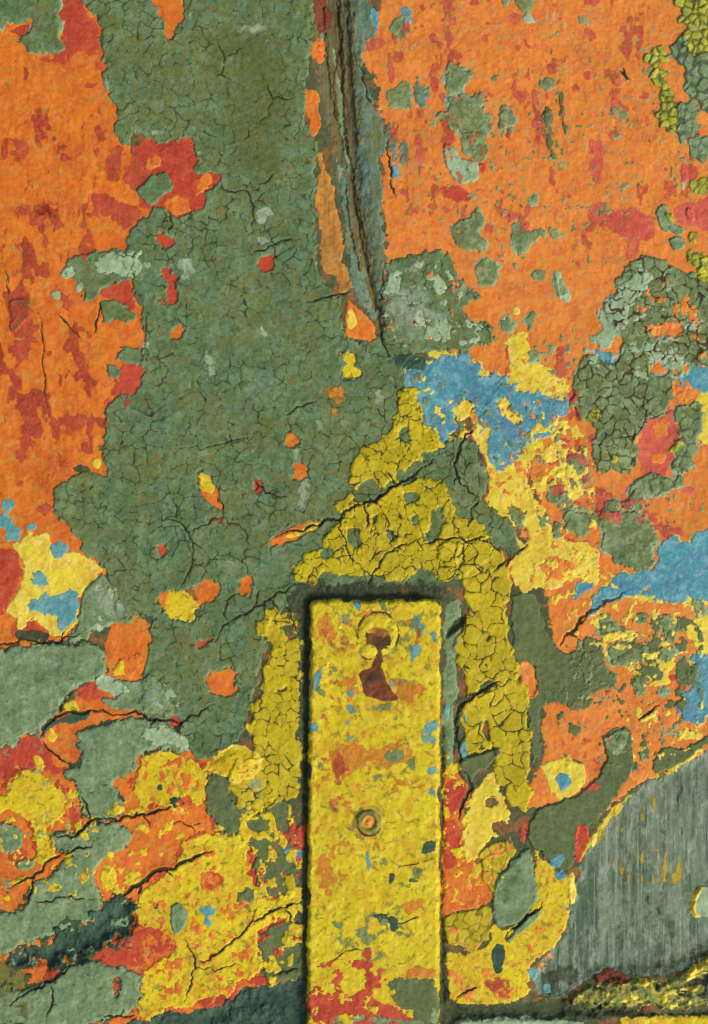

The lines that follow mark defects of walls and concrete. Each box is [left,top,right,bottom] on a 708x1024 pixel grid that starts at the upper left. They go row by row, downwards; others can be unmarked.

crack [575,256,708,472]
crack [41,0,530,820]
spalling [404,588,444,603]
peeling [400,616,425,663]
peeling [421,721,438,748]
crack [12,797,212,904]
peeling [382,858,422,888]
peeling [620,849,682,885]
peeling [690,885,708,918]
crack [183,903,299,1001]
crack [9,968,68,1017]
crack [104,1009,134,1018]